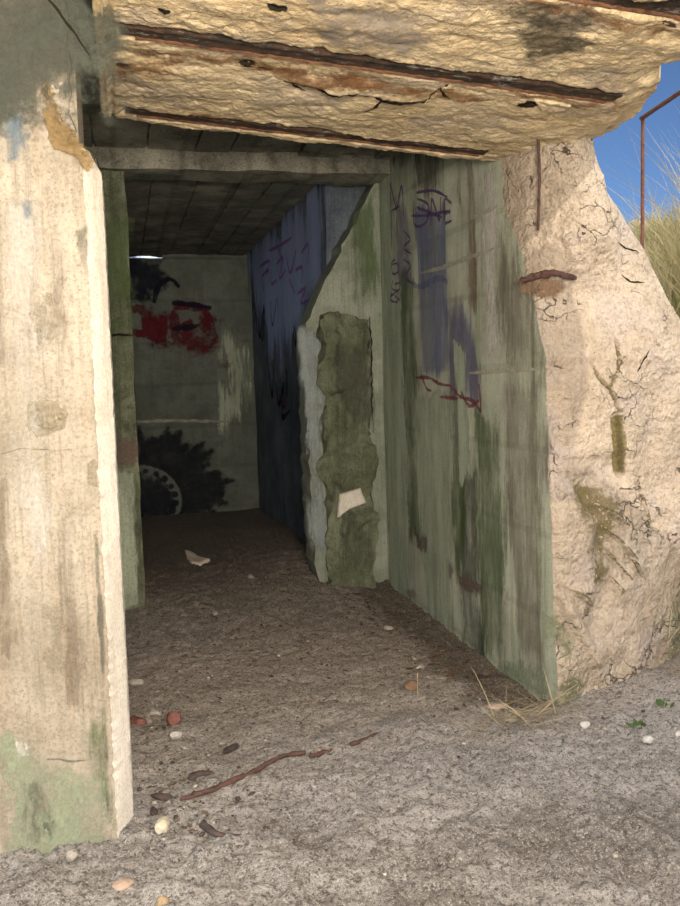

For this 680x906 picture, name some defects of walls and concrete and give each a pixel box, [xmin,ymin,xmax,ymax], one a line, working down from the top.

crack [48,0,91,58]
water stain [505,1,595,62]
corrosion [605,20,636,33]
corrosion [114,53,483,103]
crack [237,65,450,112]
spalling [42,83,93,171]
water stain [478,166,505,355]
water stain [379,152,484,656]
crack [593,345,650,412]
spalling [337,488,366,517]